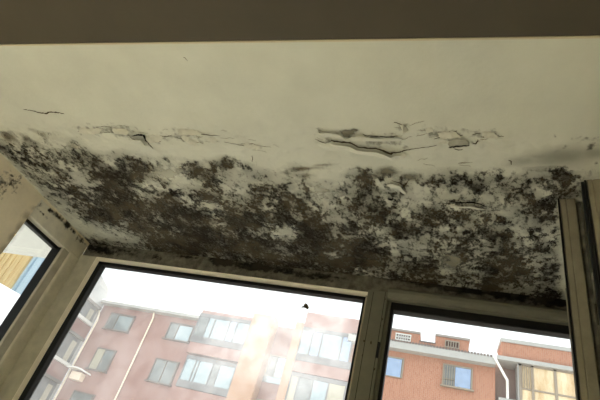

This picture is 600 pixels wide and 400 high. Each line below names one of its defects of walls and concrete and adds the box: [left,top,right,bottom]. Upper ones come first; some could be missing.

peeling [78,125,266,152]
peeling [318,121,462,161]
leakage [0,134,581,309]